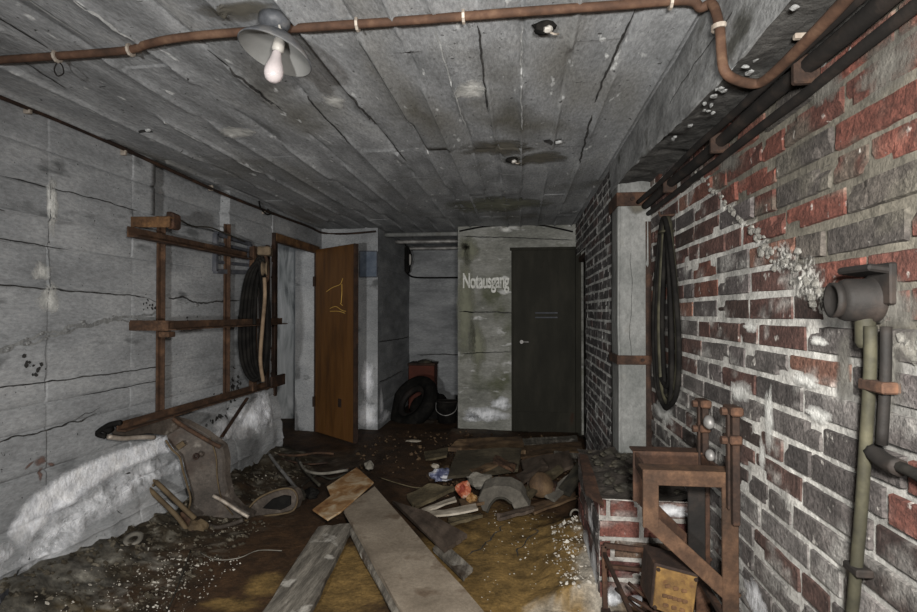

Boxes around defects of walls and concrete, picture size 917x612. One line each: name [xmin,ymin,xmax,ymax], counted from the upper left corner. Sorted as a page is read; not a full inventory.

crack [208,50,280,109]
crack [579,11,635,163]
crack [0,176,240,442]
water stain [215,394,273,439]
water stain [0,435,184,568]